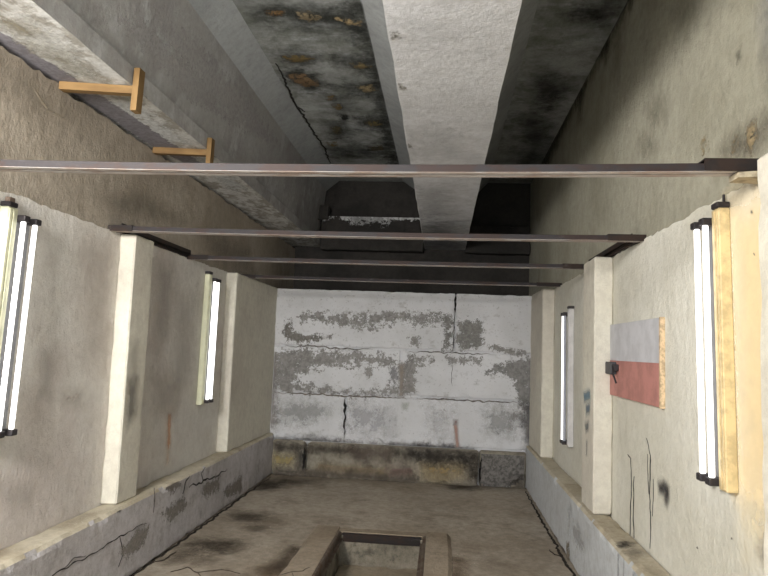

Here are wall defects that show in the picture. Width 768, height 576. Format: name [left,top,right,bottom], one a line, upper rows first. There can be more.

crack [275,63,331,163]
leakage [255,3,399,164]
leakage [518,39,610,164]
crack [277,295,517,435]
peeling [273,309,531,425]
crack [52,477,270,576]
crack [182,468,227,494]
leakage [659,482,669,504]